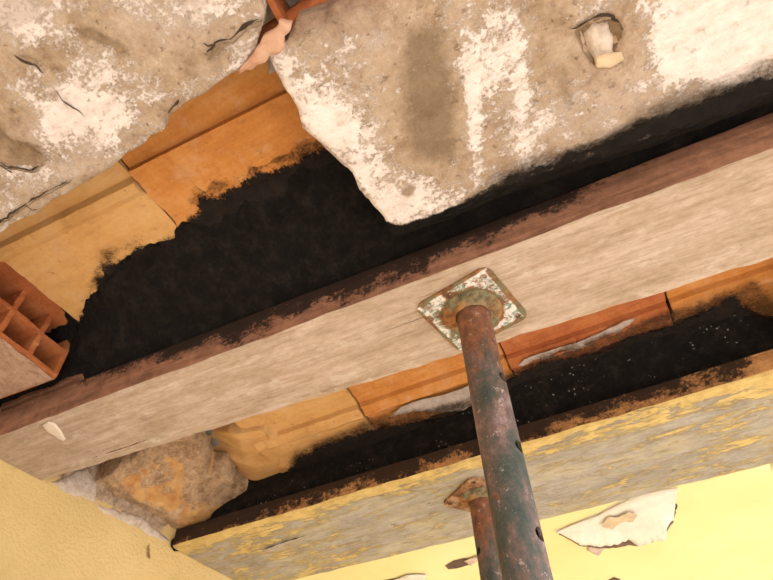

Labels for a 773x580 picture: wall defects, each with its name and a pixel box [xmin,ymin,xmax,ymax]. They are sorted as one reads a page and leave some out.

spalling [74,28,127,54]
crack [203,19,265,61]
spalling [572,13,624,68]
leakage [408,33,451,158]
crack [0,163,42,173]
spalling [0,128,46,167]
crack [0,178,74,226]
peeling [42,421,66,442]
spalling [208,422,295,481]
spalling [52,469,170,541]
peeling [553,488,678,556]
peeling [445,556,478,569]